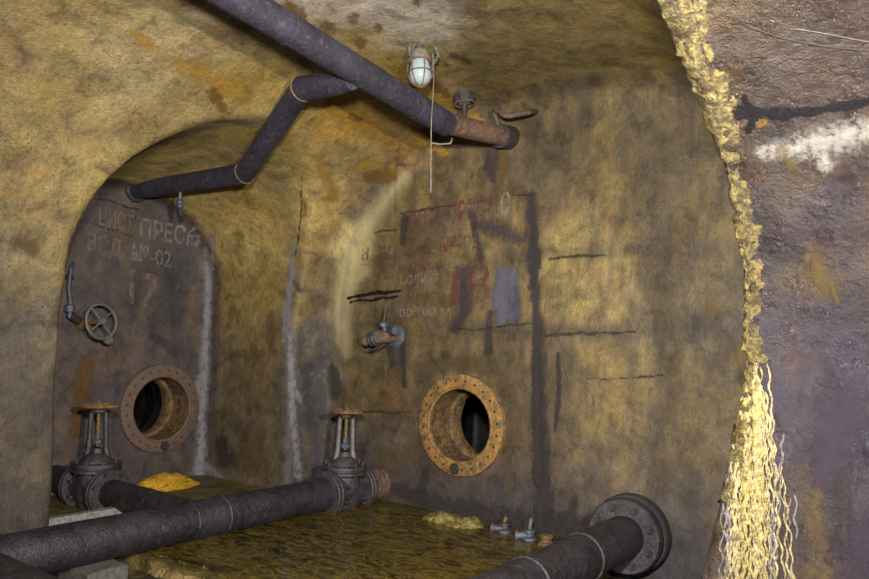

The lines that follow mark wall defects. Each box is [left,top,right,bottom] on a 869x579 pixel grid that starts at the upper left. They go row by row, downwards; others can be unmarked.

damp [756,121,869,172]
damp [192,236,229,479]
damp [268,243,302,479]
damp [381,192,590,537]
damp [657,0,798,579]